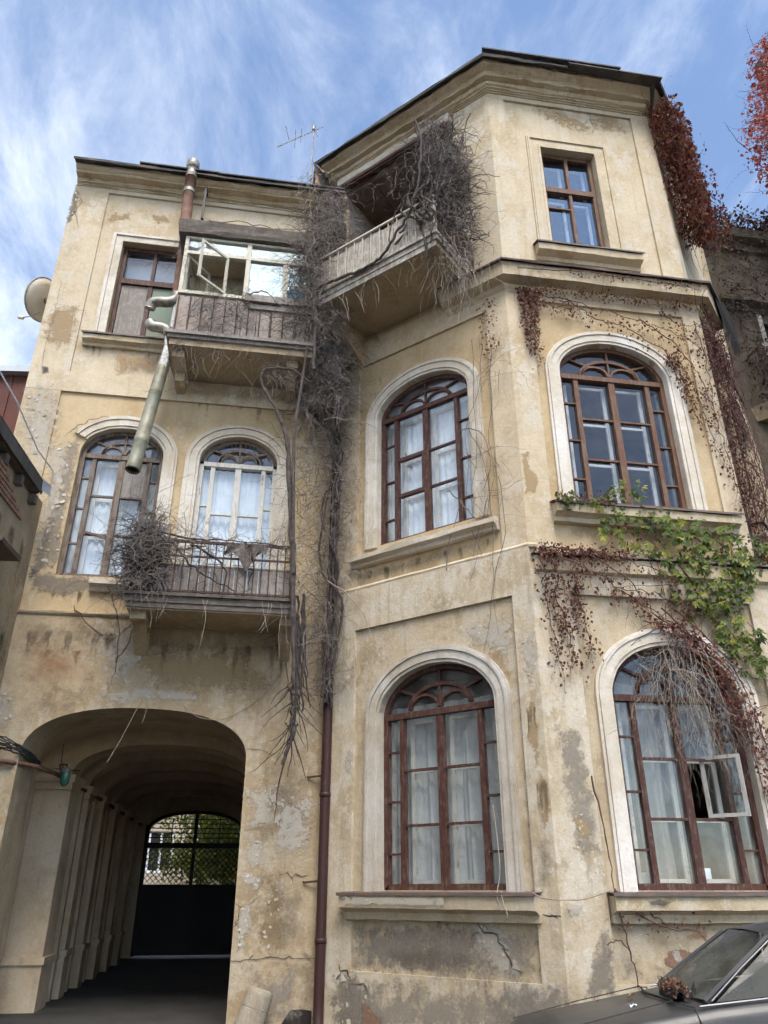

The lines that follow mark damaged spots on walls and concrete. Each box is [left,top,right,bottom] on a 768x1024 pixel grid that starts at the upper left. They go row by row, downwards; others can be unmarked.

peeling [44,306,80,346]
peeling [236,780,320,954]
peeling [468,922,523,979]
crack [471,923,523,974]
spalling [664,949,691,968]